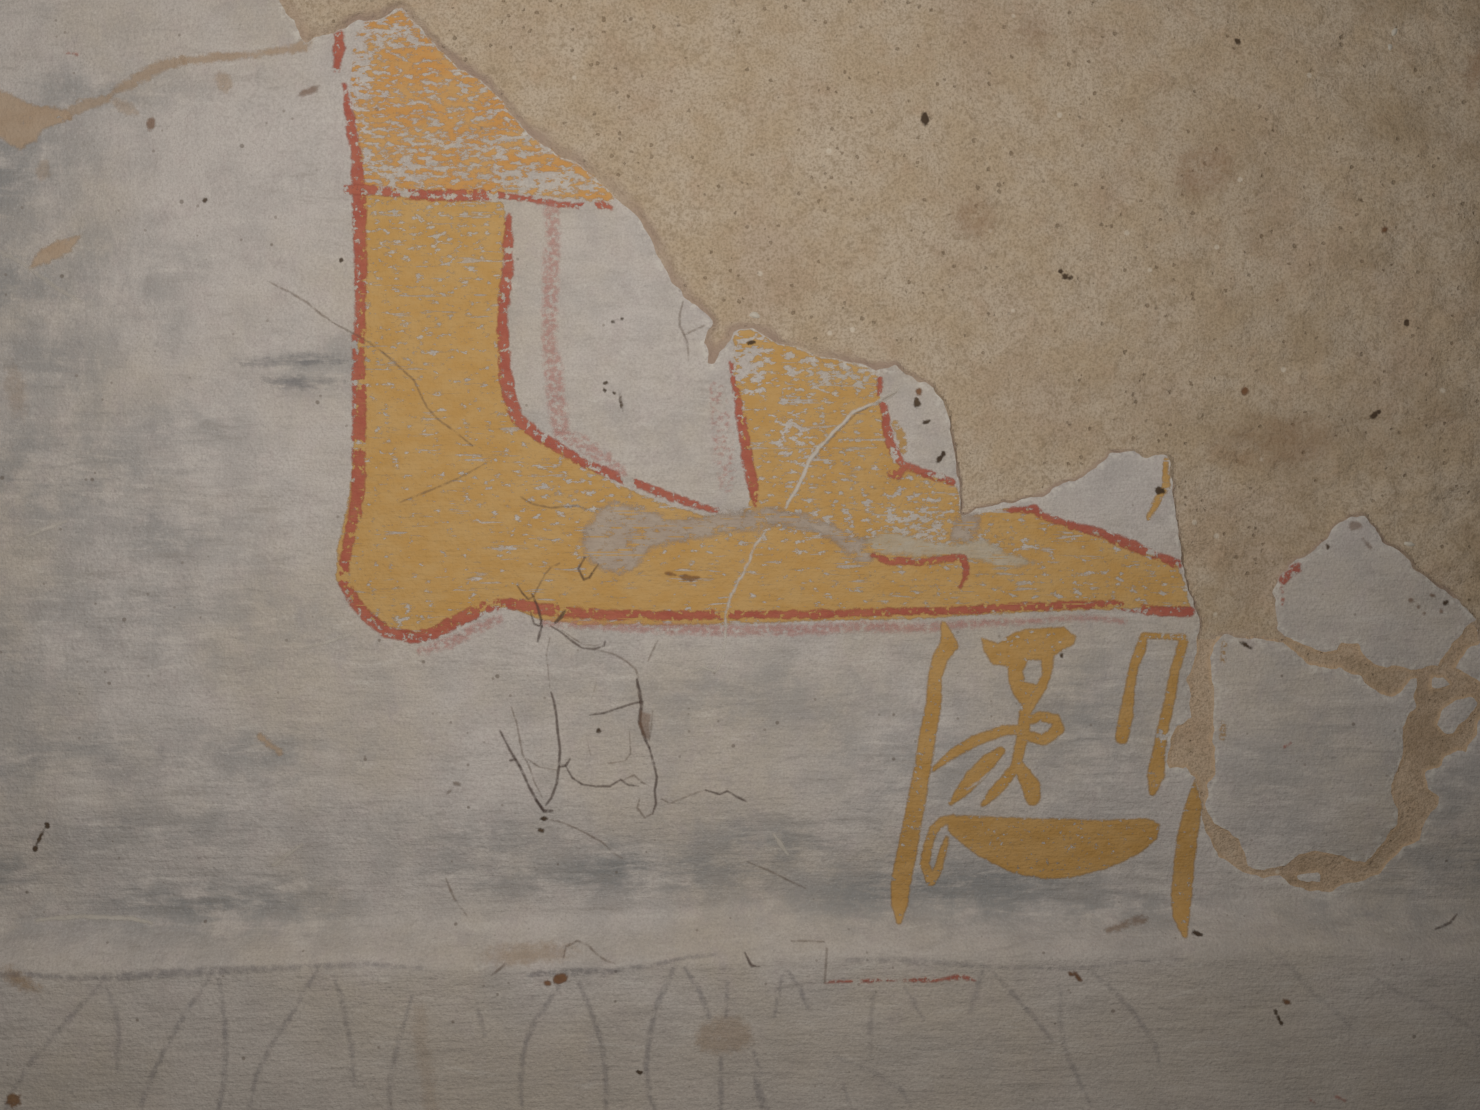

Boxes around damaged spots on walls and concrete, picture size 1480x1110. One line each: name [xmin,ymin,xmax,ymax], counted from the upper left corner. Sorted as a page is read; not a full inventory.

spalling [279,0,1480,642]
crack [578,386,900,672]
crack [951,515,980,541]
crack [523,594,597,649]
crack [507,684,657,812]